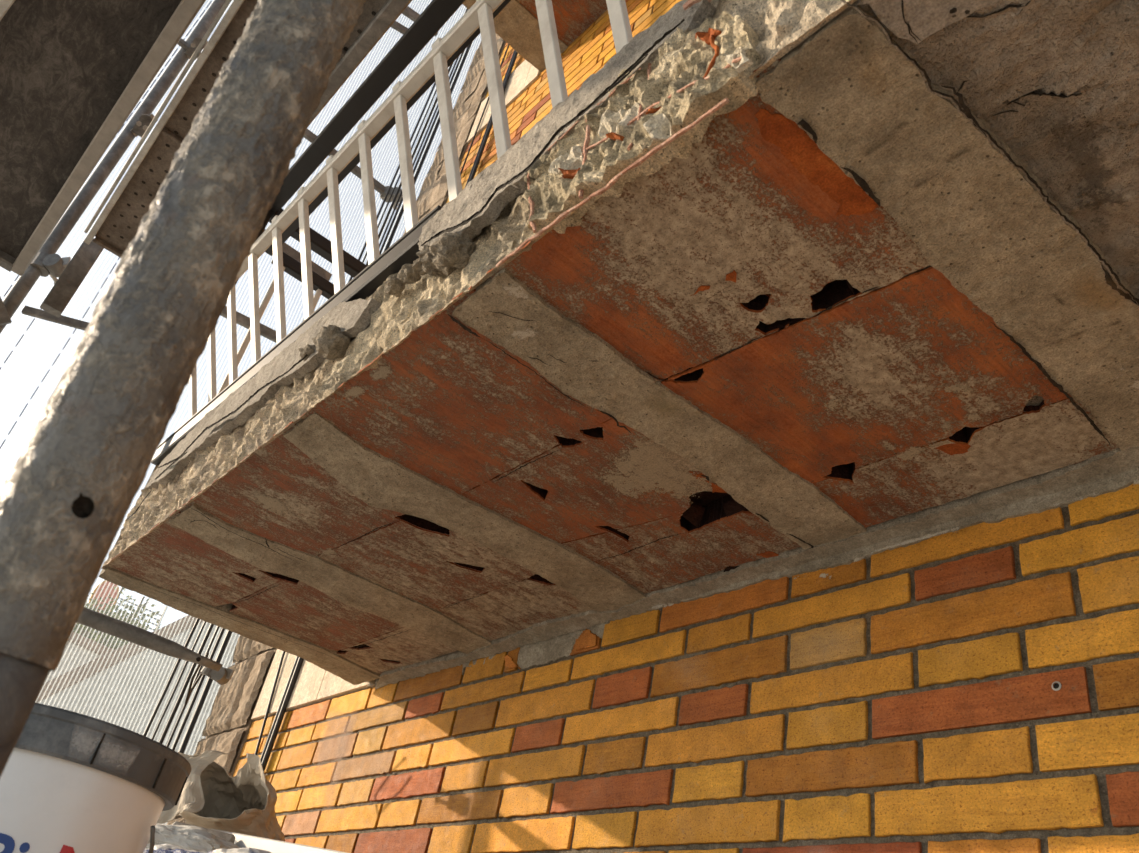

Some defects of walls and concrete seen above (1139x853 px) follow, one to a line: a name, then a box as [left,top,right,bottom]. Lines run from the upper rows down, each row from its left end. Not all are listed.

spalling [496,11,878,268]
crack [797,119,818,143]
crack [841,0,1139,307]
crack [125,353,309,521]
peeling [689,471,747,517]
spalling [936,443,971,455]
crack [991,322,1113,447]